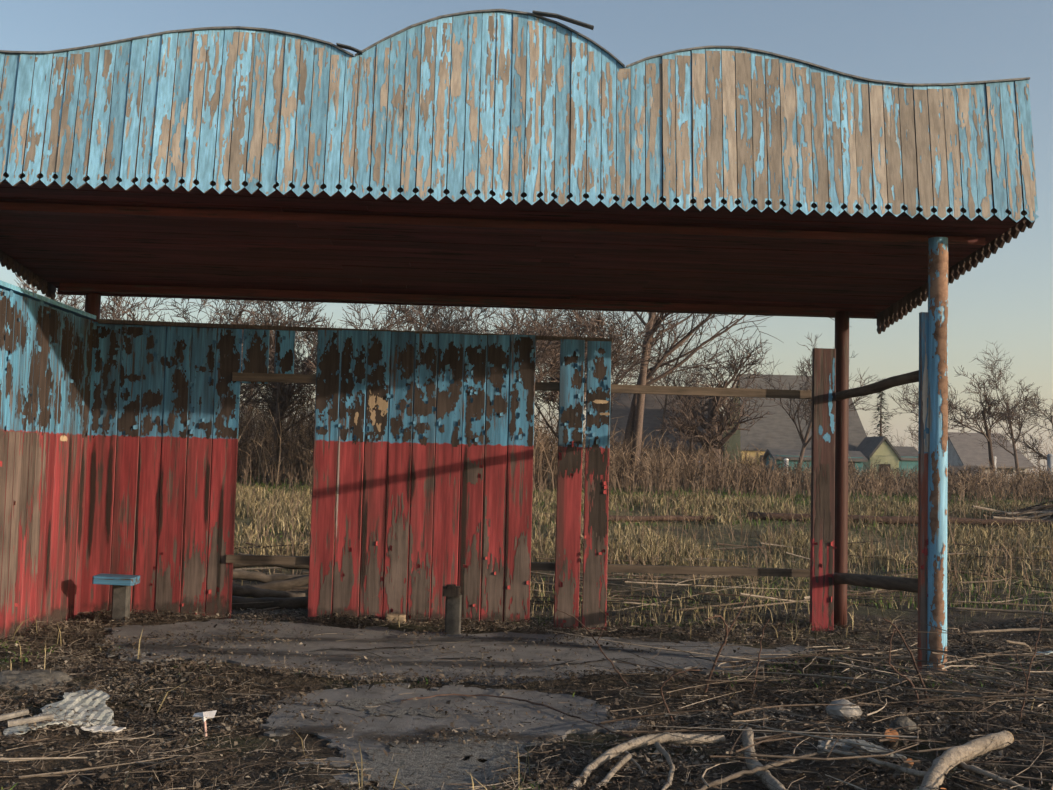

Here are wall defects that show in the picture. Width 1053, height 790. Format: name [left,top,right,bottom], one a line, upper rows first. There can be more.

peeling [0,15,1036,220]
peeling [0,289,293,615]
peeling [317,493,435,620]
peeling [315,332,535,485]
peeling [463,496,530,623]
peeling [555,343,610,628]
corrosion [927,241,948,675]